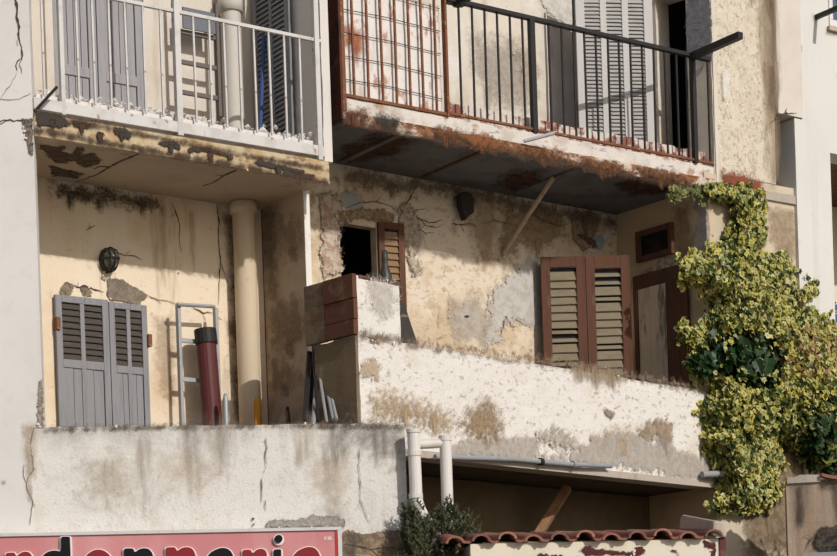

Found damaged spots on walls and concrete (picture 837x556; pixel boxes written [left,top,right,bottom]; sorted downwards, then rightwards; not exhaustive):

crack [0,0,29,124]
water stain [760,0,779,180]
spalling [21,117,101,179]
water stain [50,179,162,215]
corrosion [34,111,330,185]
crack [333,185,564,234]
corrosion [333,105,702,197]
crack [147,205,229,320]
peeling [358,252,710,394]
crack [23,429,36,525]
peeling [452,416,722,482]
peeling [580,546,645,556]